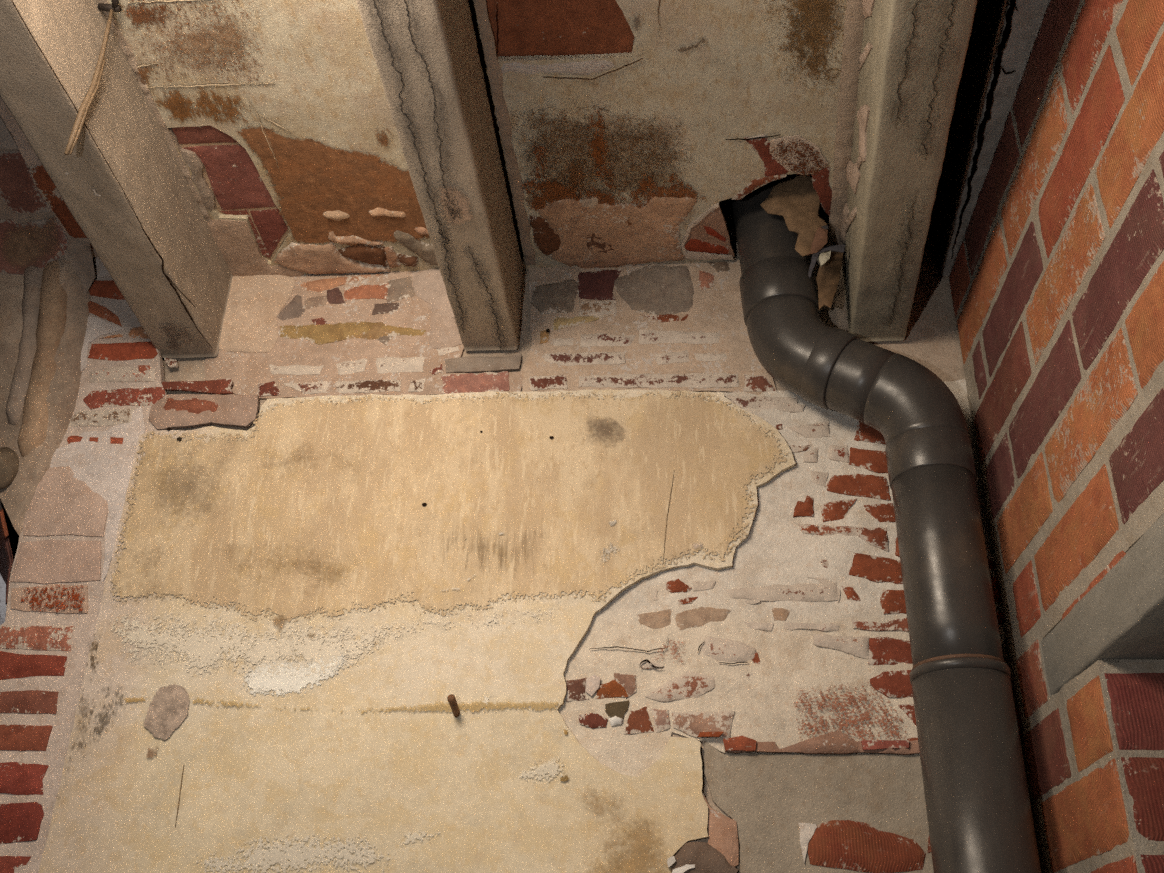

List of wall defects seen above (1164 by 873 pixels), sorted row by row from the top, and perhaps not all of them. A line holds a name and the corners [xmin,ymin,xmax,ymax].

damp [512,102,690,202]
damp [764,0,845,90]
crack [951,0,1018,258]
spalling [204,134,920,777]
spalling [943,379,1007,646]